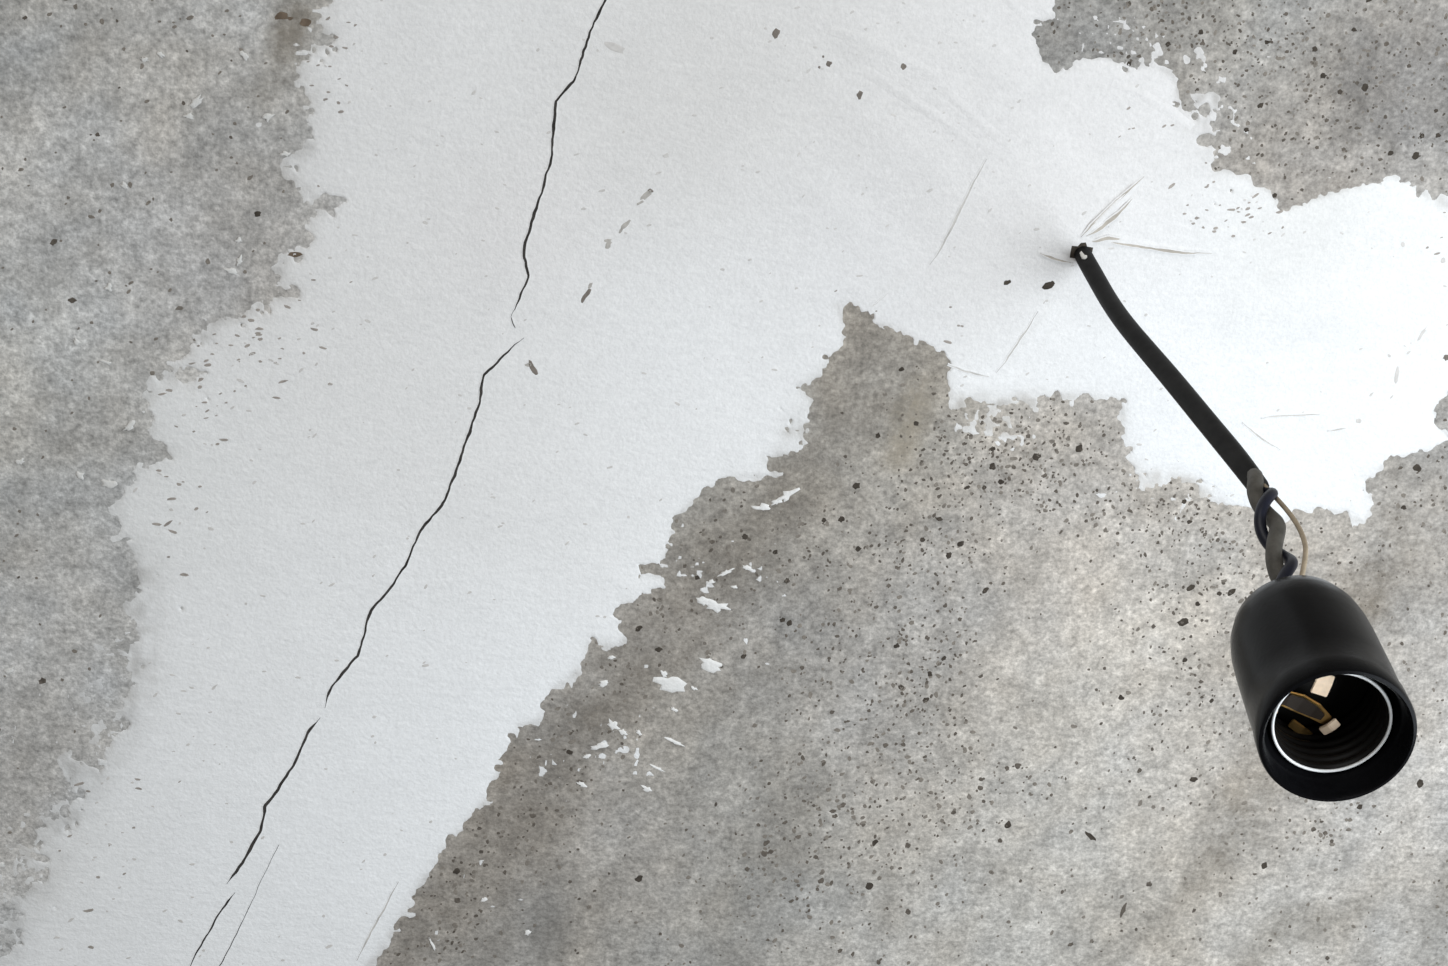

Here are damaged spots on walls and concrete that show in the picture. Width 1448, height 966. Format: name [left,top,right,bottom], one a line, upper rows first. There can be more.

peeling [182,95,204,119]
peeling [222,237,243,276]
crack [189,0,608,966]
peeling [751,488,800,510]
peeling [696,565,754,613]
peeling [700,658,722,673]
peeling [653,670,698,712]
peeling [583,719,642,759]